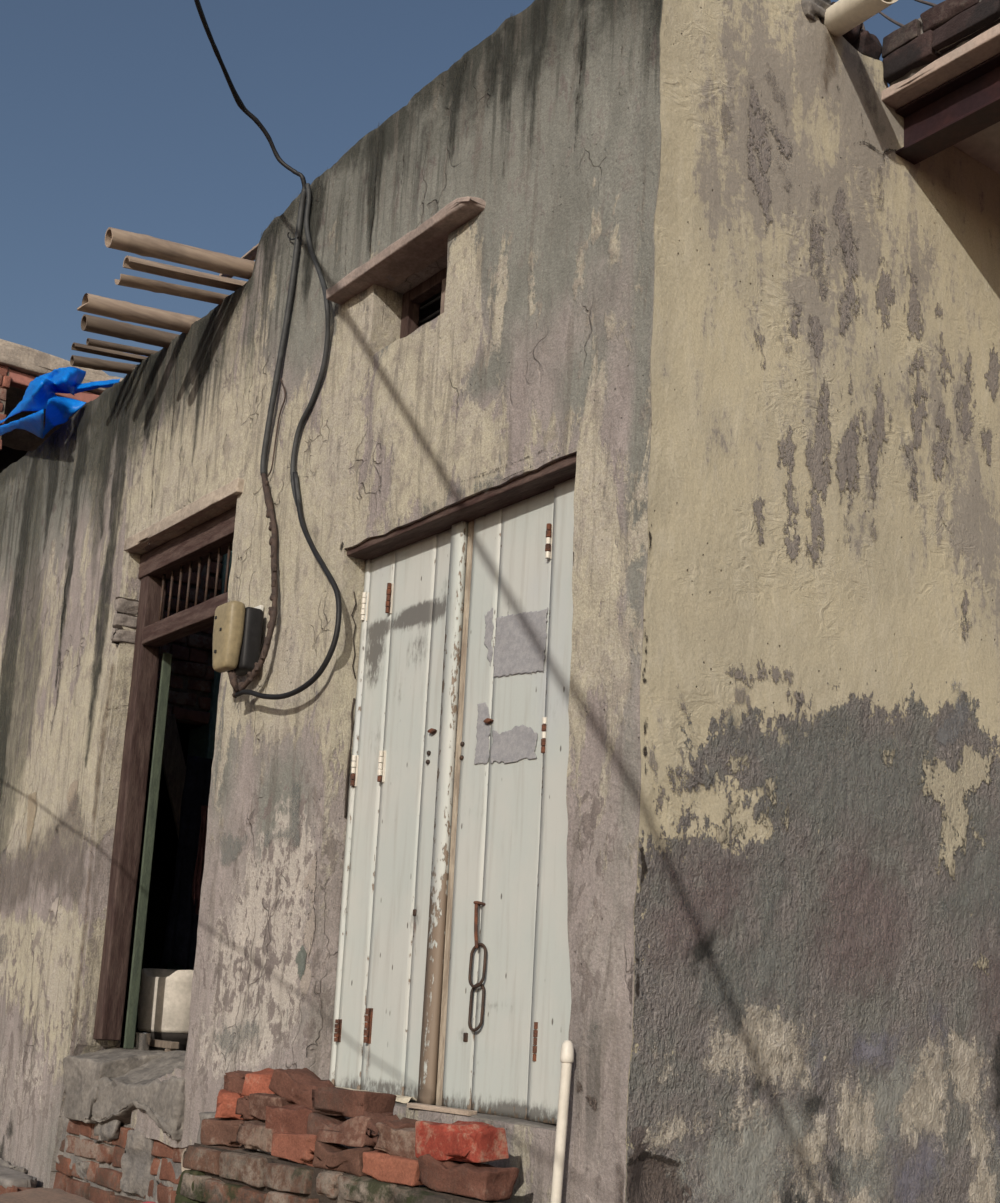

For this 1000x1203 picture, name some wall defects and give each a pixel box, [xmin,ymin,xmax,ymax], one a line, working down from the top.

damp [486,0,562,142]
damp [261,218,279,282]
damp [297,180,326,299]
damp [367,125,384,248]
peeling [745,62,793,231]
damp [180,311,216,424]
peeling [777,184,1000,567]
peeling [752,497,766,545]
damp [0,352,162,907]
peeling [725,655,811,715]
peeling [646,741,716,840]
flaking render [627,1124,693,1203]